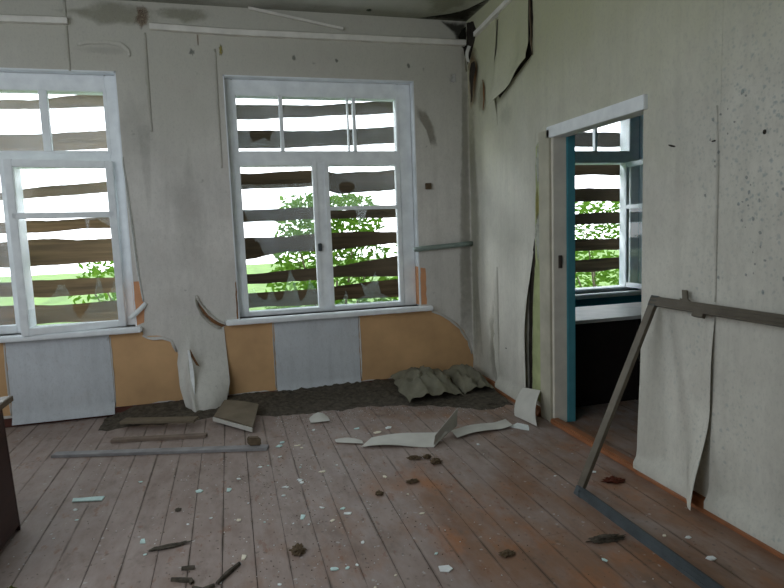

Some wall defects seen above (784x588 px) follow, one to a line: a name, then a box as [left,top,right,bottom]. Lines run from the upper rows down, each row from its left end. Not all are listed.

spalling [465,21,476,102]
peeling [488,0,533,105]
peeling [224,282,277,395]
peeling [358,266,473,381]
peeling [532,144,541,403]